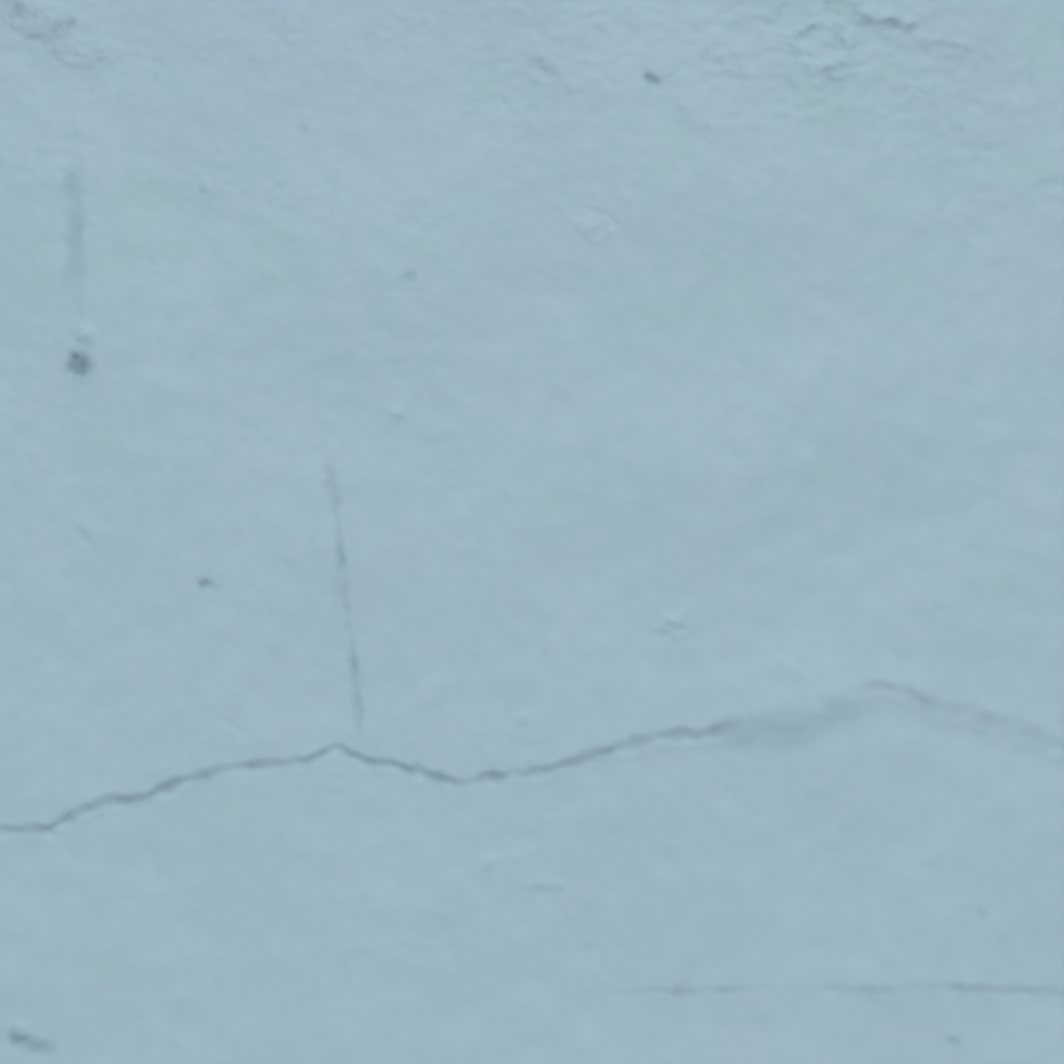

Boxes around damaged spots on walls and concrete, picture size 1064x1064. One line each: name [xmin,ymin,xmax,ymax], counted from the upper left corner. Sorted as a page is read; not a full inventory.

crack [0,670,1064,879]